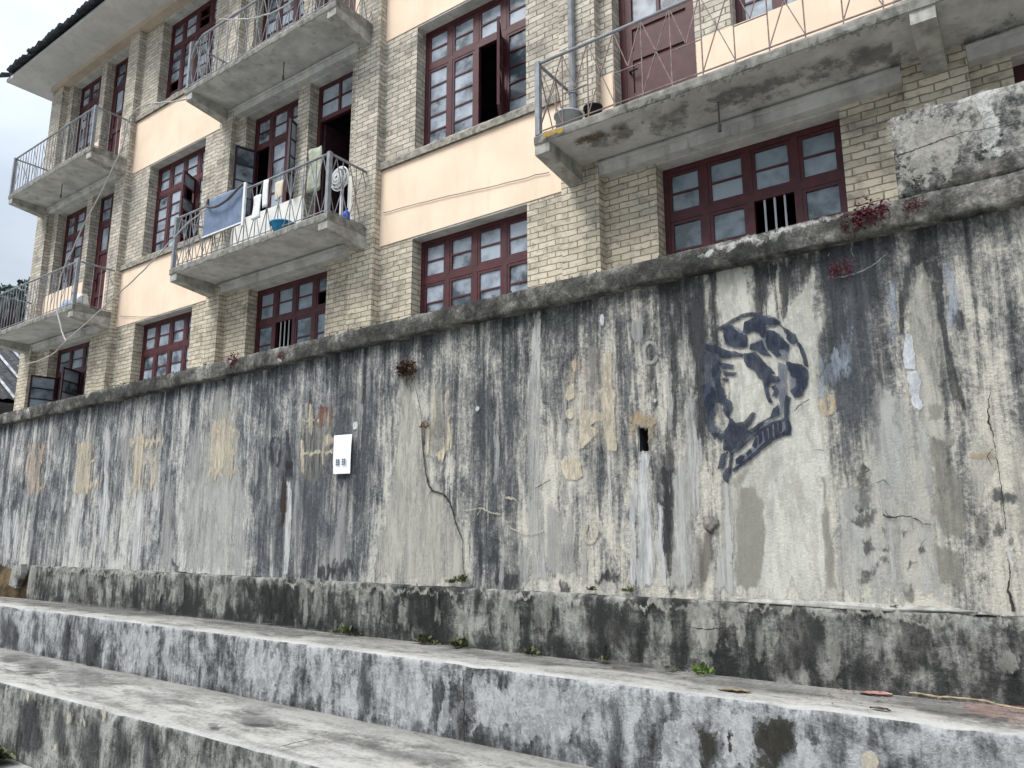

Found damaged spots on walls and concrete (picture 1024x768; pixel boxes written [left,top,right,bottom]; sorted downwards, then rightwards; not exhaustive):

water stain [889,248,965,410]
water stain [0,417,203,704]
water stain [204,434,353,634]
water stain [432,677,445,733]
crack [414,383,550,582]
peeling [480,586,581,606]
water stain [494,230,816,634]
water stain [582,597,841,691]
water stain [698,727,733,766]
peeling [631,263,985,651]
crack [883,512,933,548]
crack [976,395,1016,617]